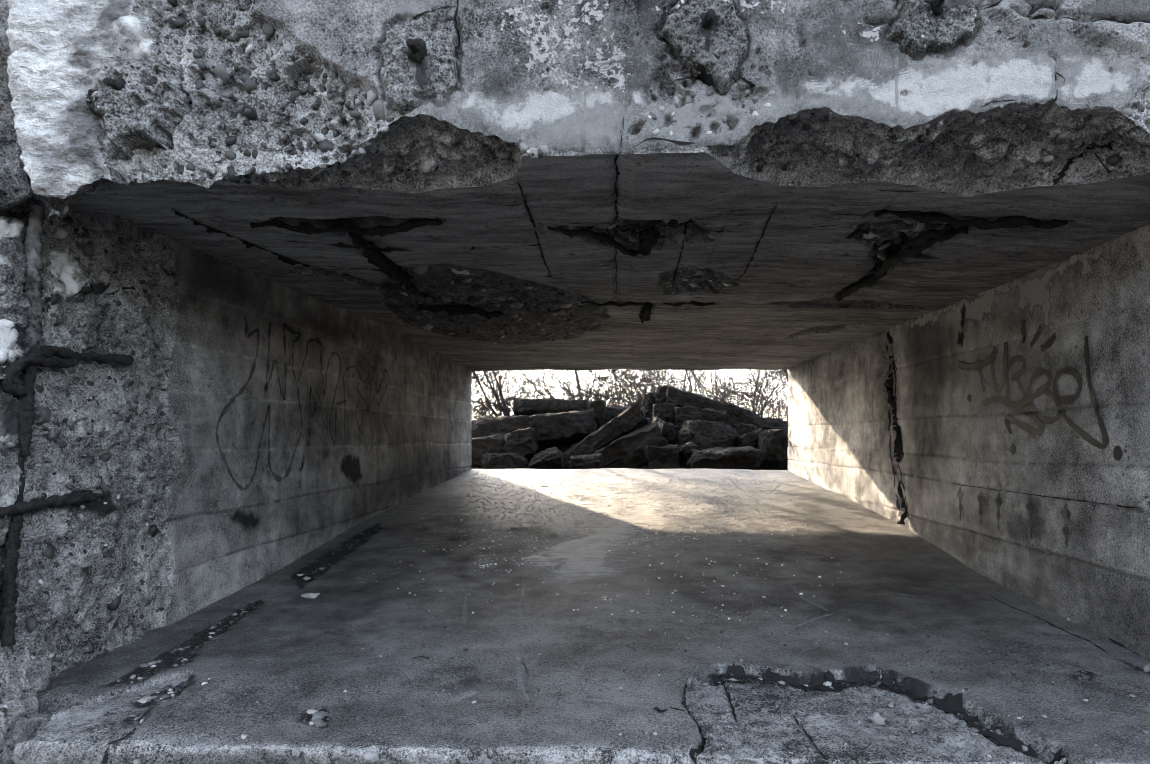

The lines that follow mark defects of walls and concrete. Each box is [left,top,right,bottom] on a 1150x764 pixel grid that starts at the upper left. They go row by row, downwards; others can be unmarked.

spalling [94,0,1150,197]
spalling [228,216,431,234]
crack [517,180,552,276]
crack [614,98,701,294]
crack [672,205,777,285]
spalling [850,219,965,270]
rust [0,205,134,647]
spalling [0,0,193,764]
crack [884,331,910,530]
crack [654,684,706,764]
spalling [684,664,1066,764]
crack [714,663,1069,764]